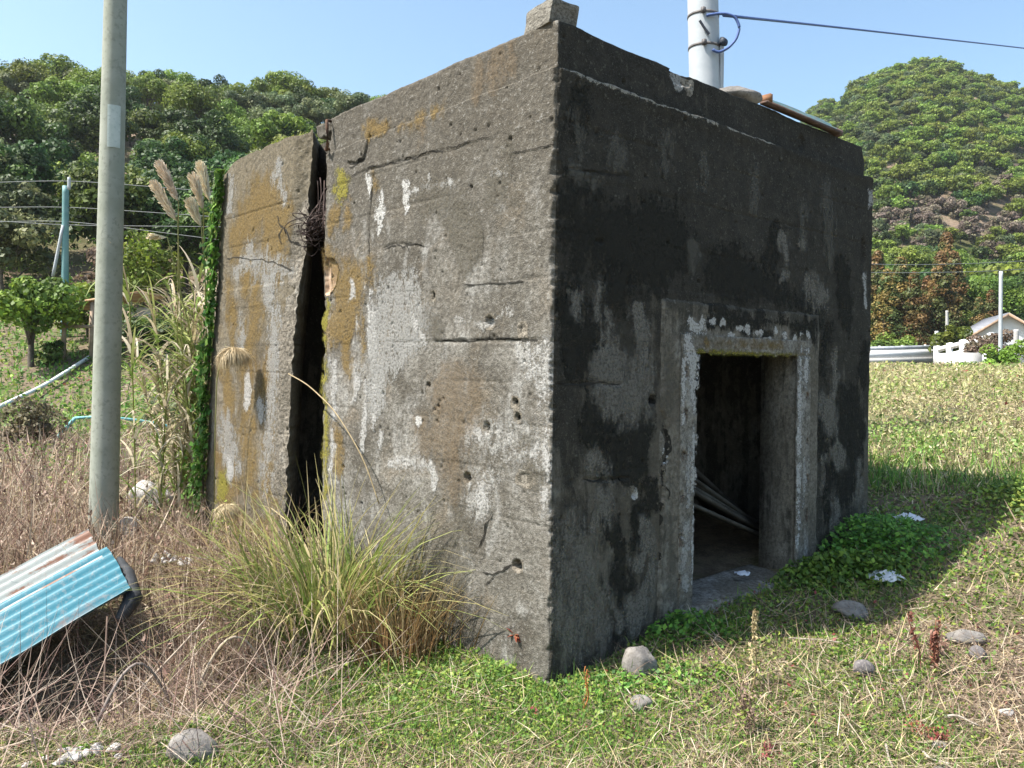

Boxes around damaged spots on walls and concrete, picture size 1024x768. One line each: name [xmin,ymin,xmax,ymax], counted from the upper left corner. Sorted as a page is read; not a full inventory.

leakage [226,176,236,218]
leakage [270,157,287,207]
crack [348,136,493,277]
spalling [325,257,339,296]
leakage [233,239,295,498]
leakage [454,83,870,645]
leakage [217,407,242,488]
peeling [680,314,810,593]
leakage [426,544,470,618]
crack [483,564,512,585]